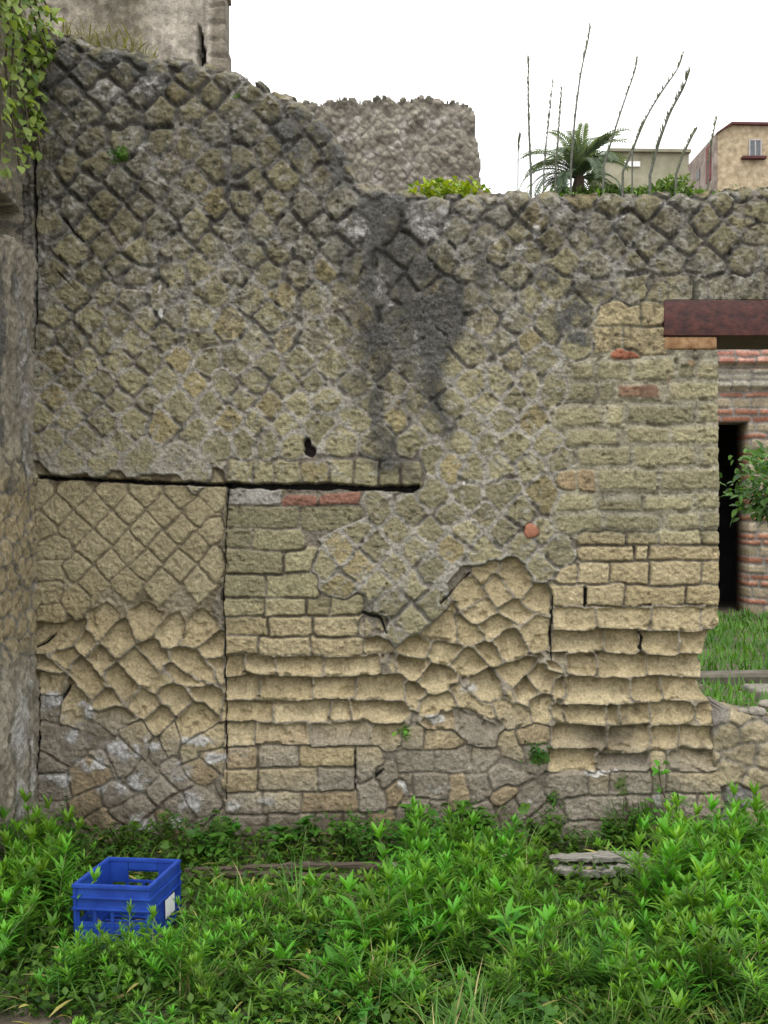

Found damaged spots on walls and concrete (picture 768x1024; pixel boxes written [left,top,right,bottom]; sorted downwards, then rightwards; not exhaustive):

damp [268,106,351,188]
crack [34,160,65,328]
damp [344,191,463,480]
crack [37,476,420,800]
crack [440,572,471,604]
crack [547,596,555,660]
crack [581,588,589,607]